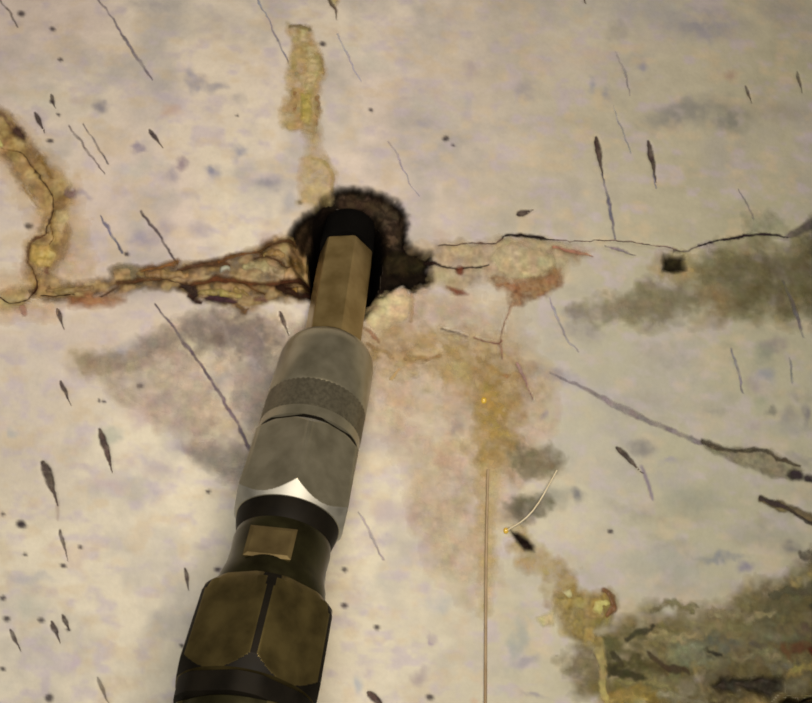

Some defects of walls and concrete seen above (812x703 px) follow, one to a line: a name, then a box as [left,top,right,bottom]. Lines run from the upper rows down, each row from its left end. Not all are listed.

crack [0,110,312,315]
spalling [290,189,431,317]
crack [366,289,411,329]
crack [423,223,812,399]
damp [605,224,812,320]
damp [367,293,559,570]
damp [539,551,812,703]
spalling [715,678,781,697]